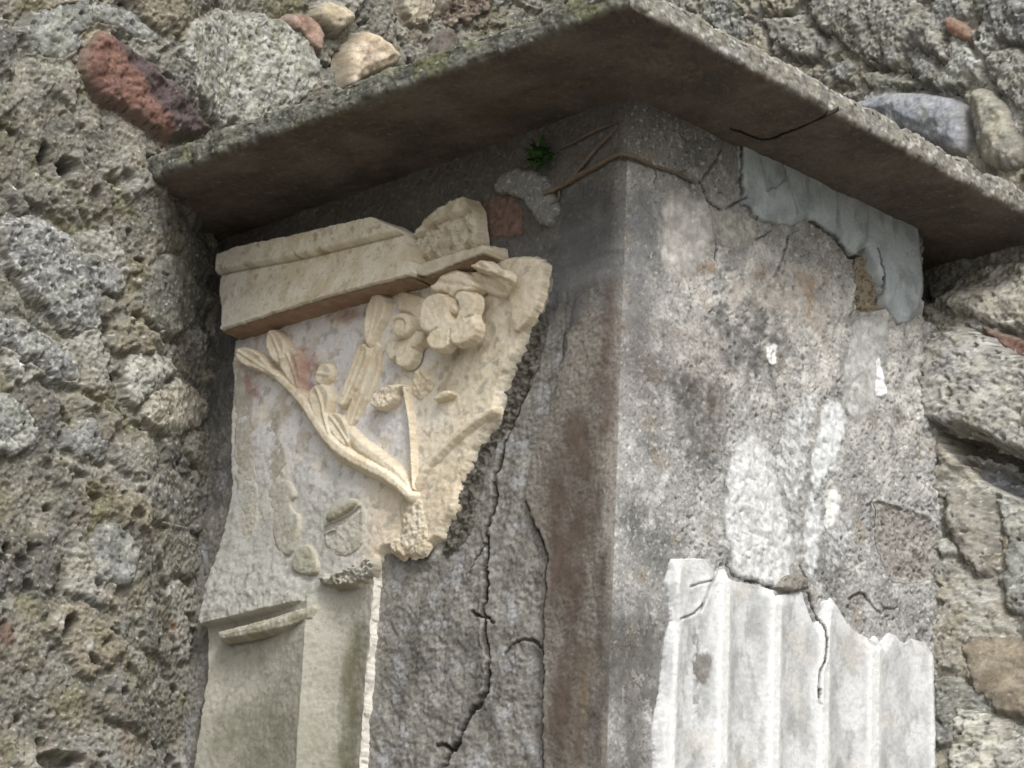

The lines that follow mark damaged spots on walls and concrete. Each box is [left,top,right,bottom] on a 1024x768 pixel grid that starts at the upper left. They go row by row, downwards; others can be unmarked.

crack [699,107,839,239]
crack [809,221,886,286]
spalling [440,312,549,558]
crack [438,387,549,762]
crack [802,573,829,698]